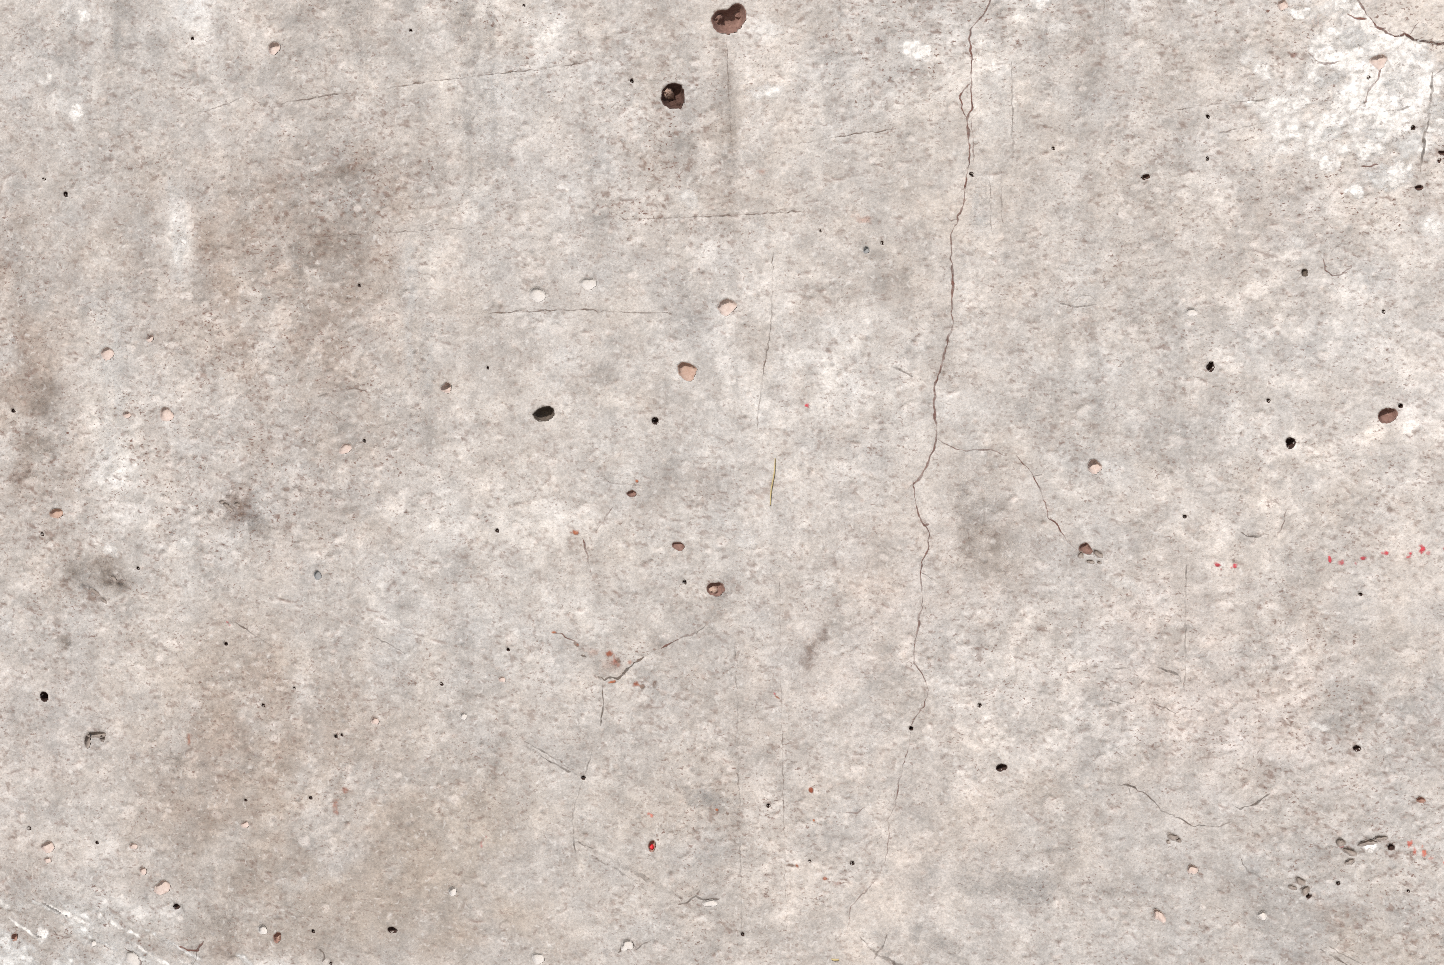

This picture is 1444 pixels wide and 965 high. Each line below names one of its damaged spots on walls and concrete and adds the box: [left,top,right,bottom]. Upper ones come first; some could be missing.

crack [897,1,990,794]
crack [1347,6,1444,45]